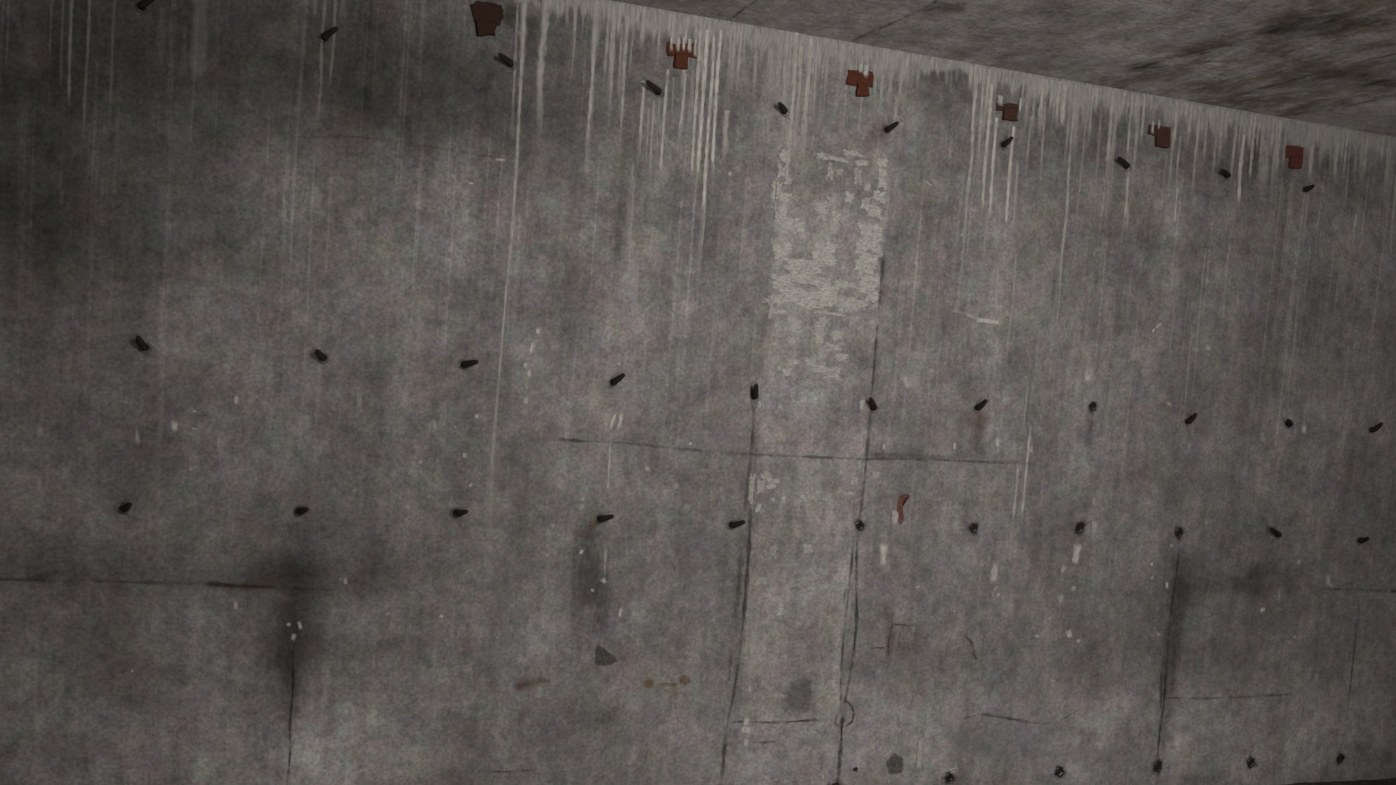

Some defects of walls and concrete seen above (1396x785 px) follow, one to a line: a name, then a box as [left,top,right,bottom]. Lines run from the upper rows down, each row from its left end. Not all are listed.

damp [499,0,1396,376]
damp [607,413,623,488]
corrosion [897,494,910,524]
damp [996,432,1032,516]